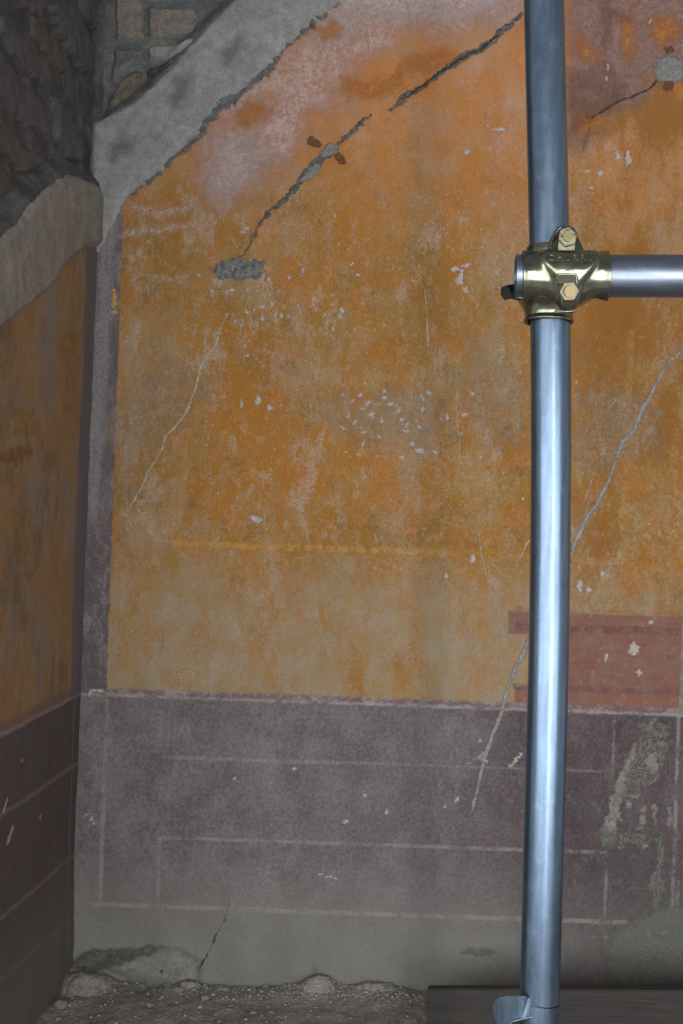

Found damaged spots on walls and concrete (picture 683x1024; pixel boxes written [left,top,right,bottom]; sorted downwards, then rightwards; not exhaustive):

crack [245,12,523,252]
crack [592,80,657,117]
spalling [197,255,299,324]
crack [124,313,228,517]
crack [571,348,683,557]
crack [453,637,529,814]
peeling [599,716,674,911]